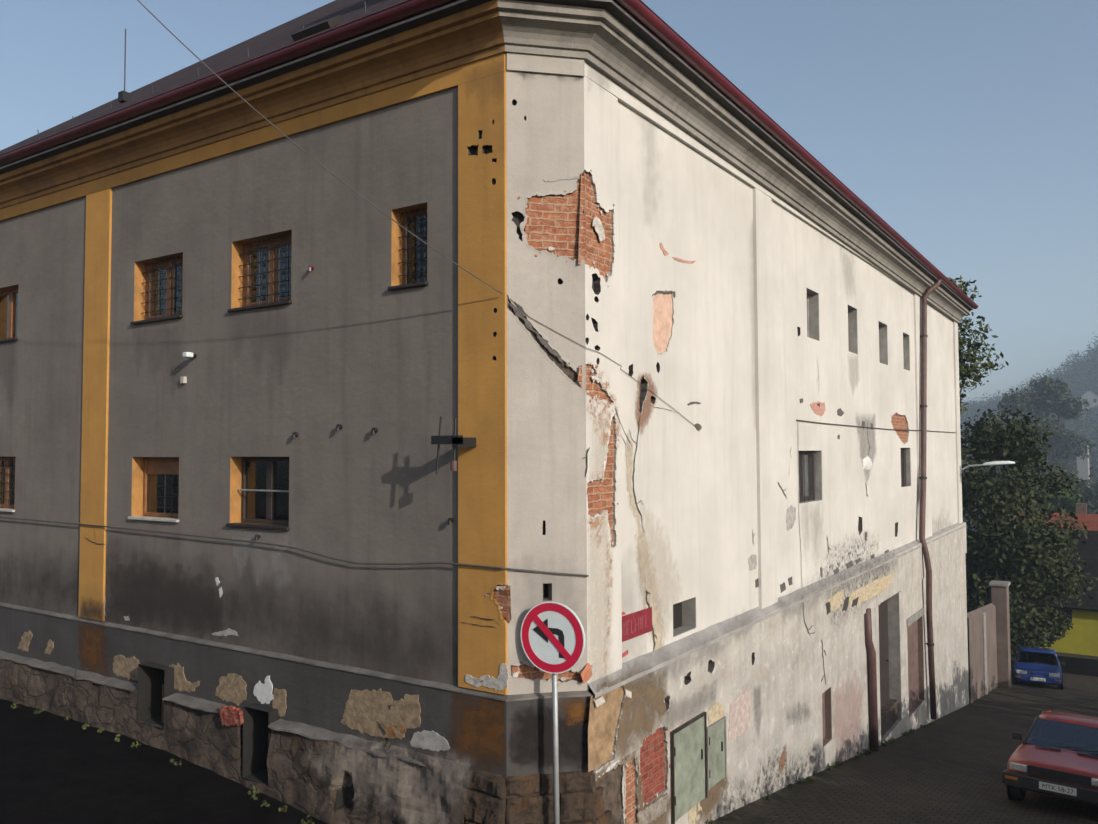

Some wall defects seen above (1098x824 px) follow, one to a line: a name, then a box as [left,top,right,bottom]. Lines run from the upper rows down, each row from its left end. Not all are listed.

flaking render [517,168,616,287]
flaking render [651,289,676,358]
flaking render [509,301,619,551]
flaking render [891,411,909,445]
crack [612,407,676,533]
flaking render [484,582,511,623]
crack [646,590,657,648]
flaking render [169,663,200,692]
flaking render [215,673,287,727]
flaking render [341,688,450,752]
flaking render [465,661,593,690]
flaking render [586,678,671,824]